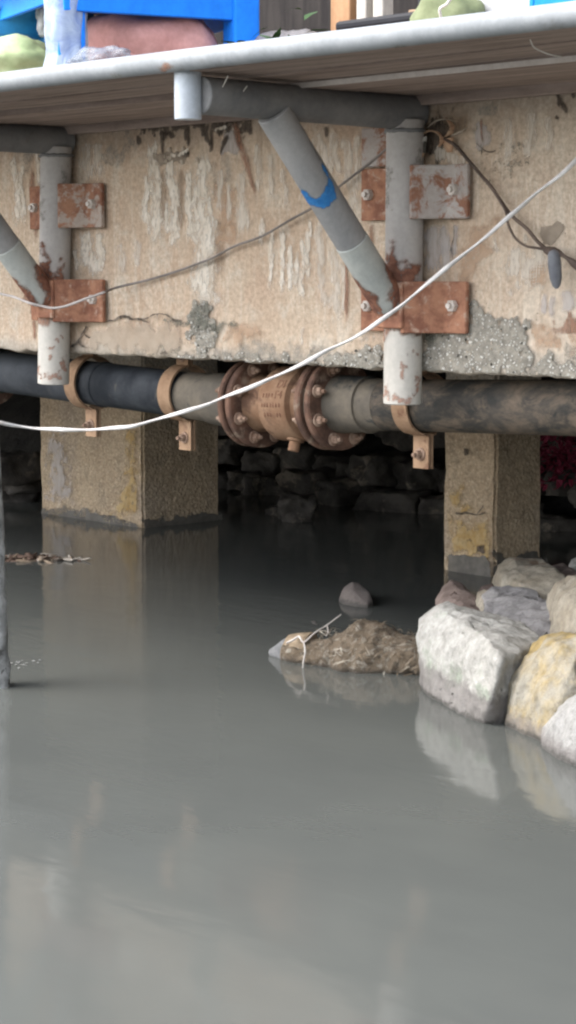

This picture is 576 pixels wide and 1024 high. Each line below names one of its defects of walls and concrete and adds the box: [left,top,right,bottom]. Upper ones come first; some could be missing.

leakage [119,141,345,317]
rust [13,229,65,338]
crack [71,313,179,347]
spalling [160,299,384,369]
rust [344,241,421,342]
spalling [422,300,576,378]